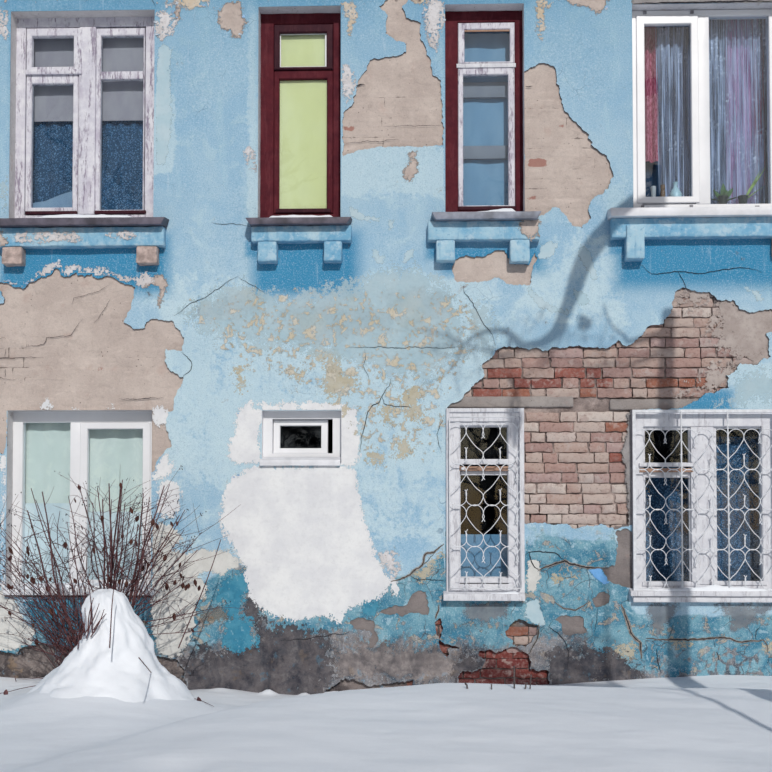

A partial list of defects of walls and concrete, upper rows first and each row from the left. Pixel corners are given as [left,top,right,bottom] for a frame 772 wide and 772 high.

peeling [154,0,249,41]
spalling [340,0,446,182]
spalling [518,64,613,242]
peeling [0,230,83,247]
crack [643,266,760,287]
crack [360,382,407,449]
spalling [380,549,446,617]
crack [528,551,603,571]
damp [179,597,343,695]
peeling [327,599,549,692]
crack [529,596,598,666]
crack [621,604,772,675]